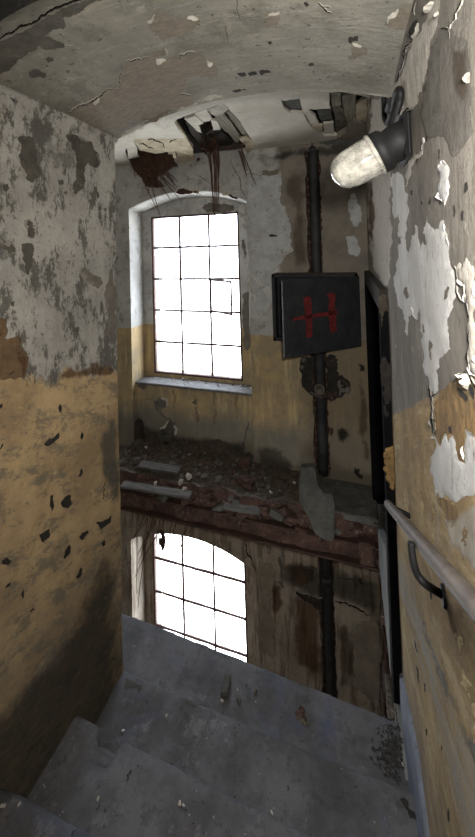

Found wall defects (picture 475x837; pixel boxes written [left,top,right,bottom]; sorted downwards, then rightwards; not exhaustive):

peeling [17,136,42,183]
peeling [58,134,106,211]
peeling [4,219,35,275]
peeling [346,0,475,528]
peeling [80,256,118,348]
peeling [0,318,29,380]
flaking render [299,357,316,396]
flaking render [325,354,351,401]
crack [428,385,437,437]
water stain [273,588,282,612]
water stain [285,566,375,608]
water stain [296,599,320,671]